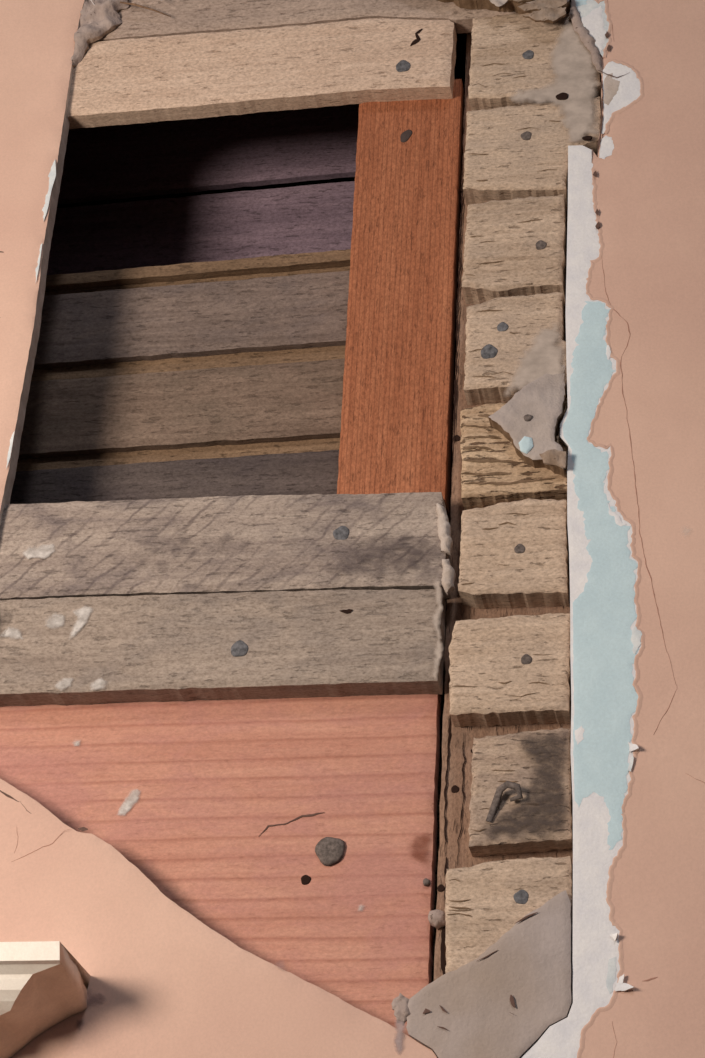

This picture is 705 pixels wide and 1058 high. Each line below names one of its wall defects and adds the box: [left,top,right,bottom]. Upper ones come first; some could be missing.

flaking render [70,0,129,67]
flaking render [42,160,56,220]
peeling [519,0,645,1058]
crack [600,245,677,734]
crack [0,790,88,862]
damp [489,734,565,838]